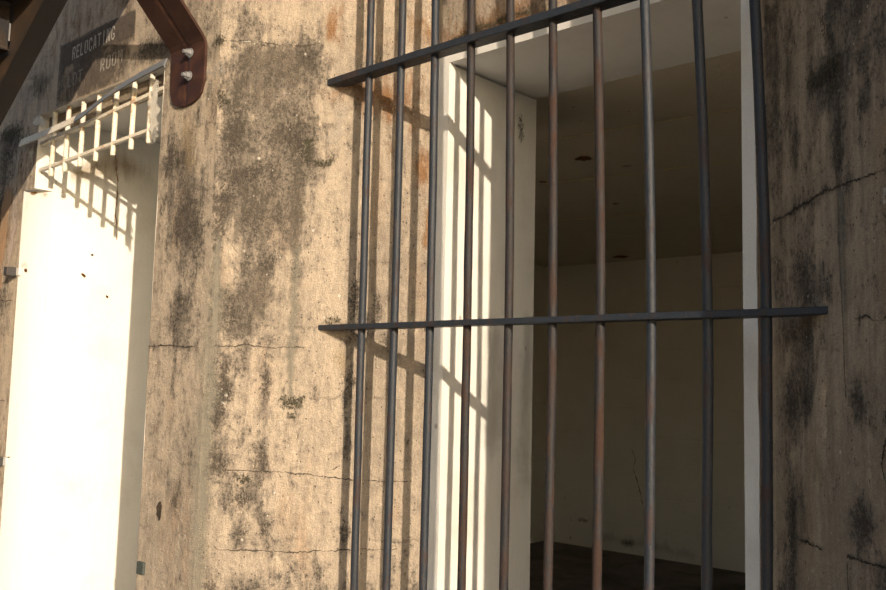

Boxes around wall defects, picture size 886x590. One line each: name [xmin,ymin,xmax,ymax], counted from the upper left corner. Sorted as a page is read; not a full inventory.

leakage [279,108,335,168]
crack [112,154,120,240]
crack [772,169,884,222]
leakage [288,184,305,396]
leakage [170,87,277,590]
crack [878,442,886,482]
crack [789,535,822,550]
crack [846,554,886,569]